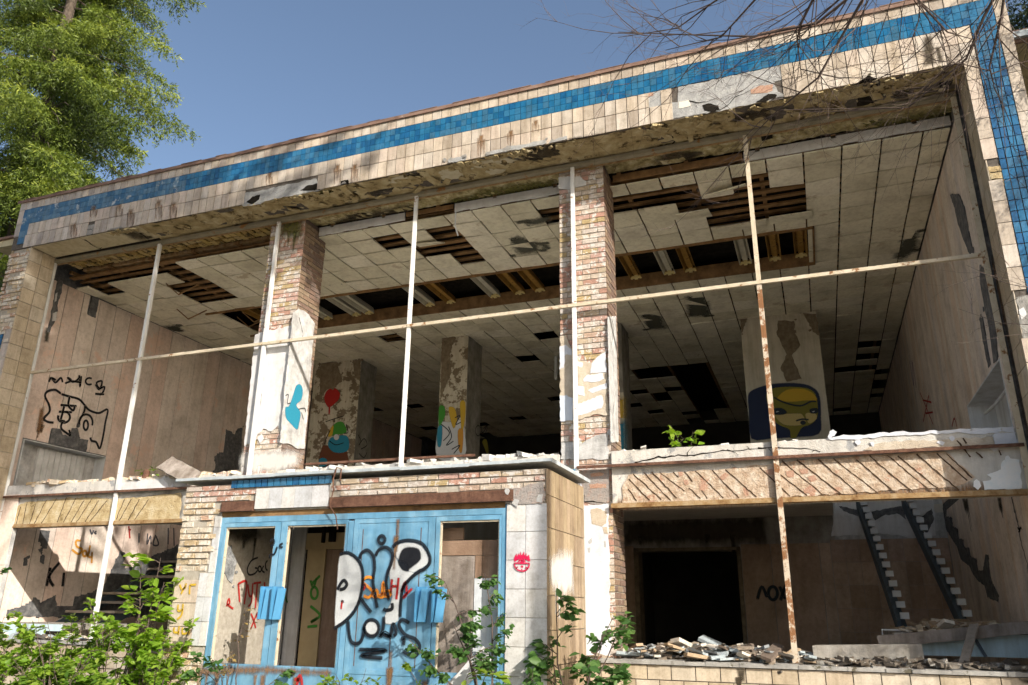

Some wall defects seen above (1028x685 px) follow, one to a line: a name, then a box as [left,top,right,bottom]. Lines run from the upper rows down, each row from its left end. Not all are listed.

spalling [616,64,803,154]
damp [730,108,776,126]
flaking render [811,65,958,114]
flaking render [210,136,578,228]
damp [522,145,560,162]
flaking render [558,176,596,190]
damp [656,152,702,166]
flaking render [213,309,363,475]
peeling [440,337,456,400]
spalling [559,313,1022,656]
rust [792,484,1004,497]